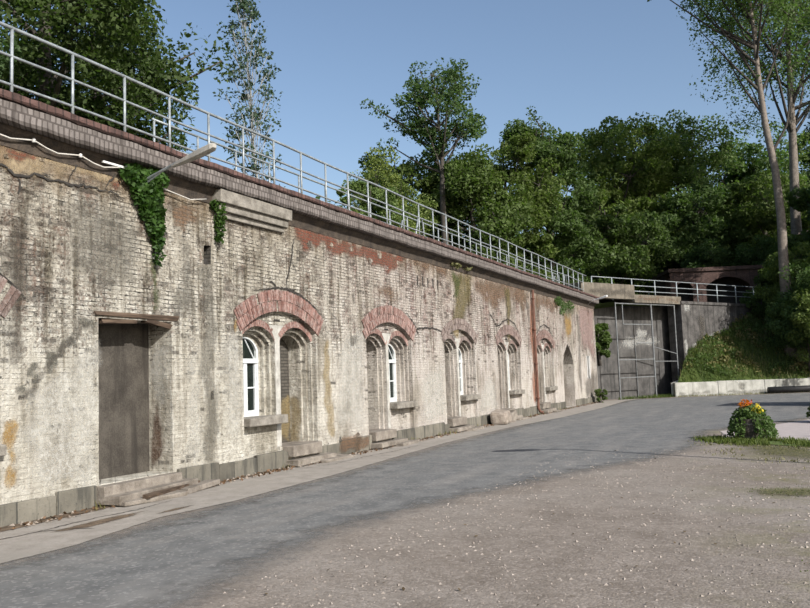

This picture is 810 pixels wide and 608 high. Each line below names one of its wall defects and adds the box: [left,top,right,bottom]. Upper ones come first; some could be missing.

peeling [0,145,121,190]
crack [0,163,125,200]
peeling [295,227,403,272]
rust [3,422,17,457]